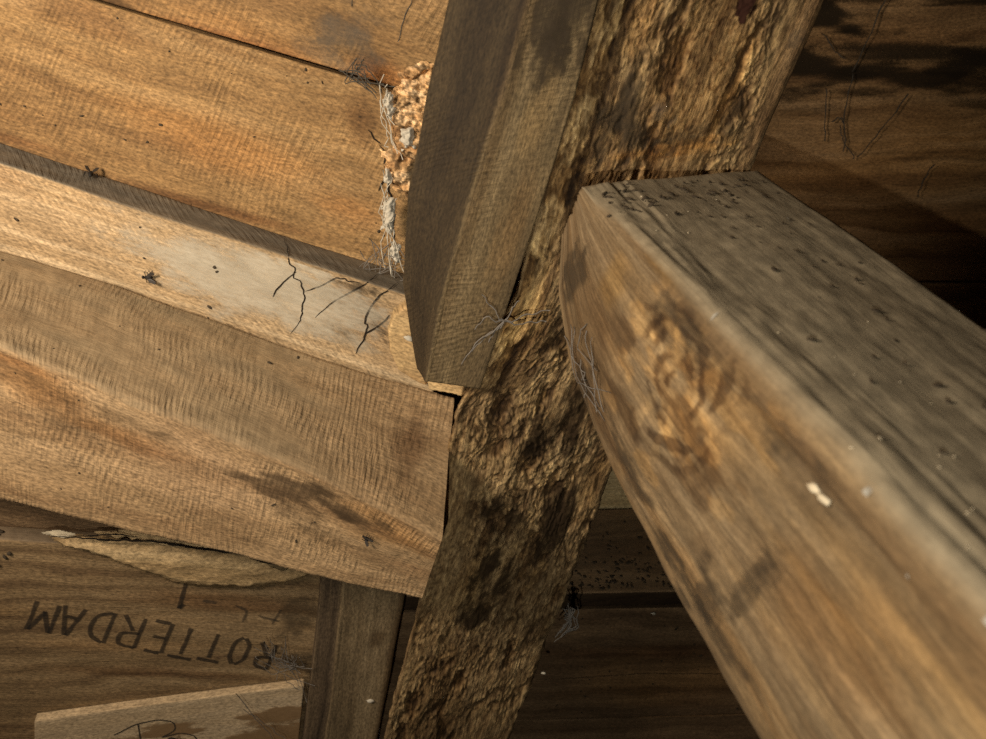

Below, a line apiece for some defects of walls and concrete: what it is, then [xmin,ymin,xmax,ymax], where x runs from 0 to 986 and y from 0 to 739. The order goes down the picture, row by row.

damp [782,0,986,107]
crack [273,240,395,353]
damp [522,370,588,464]
damp [535,479,577,560]
damp [455,540,513,630]